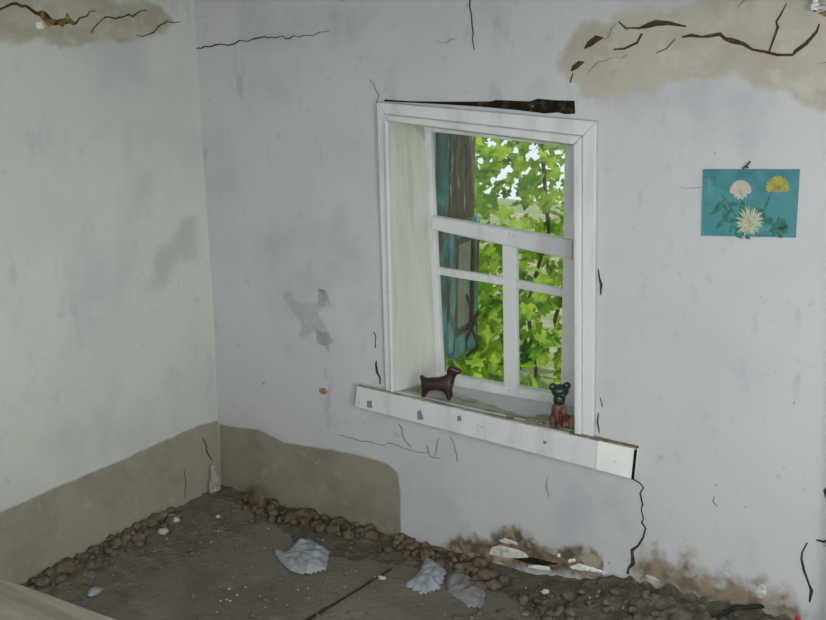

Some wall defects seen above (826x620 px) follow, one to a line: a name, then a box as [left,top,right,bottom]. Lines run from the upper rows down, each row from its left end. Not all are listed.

crack [0,2,178,37]
crack [196,30,330,49]
crack [569,3,820,83]
crack [339,424,457,462]
crack [626,479,646,574]
flaking render [488,538,612,575]
crack [800,539,826,602]